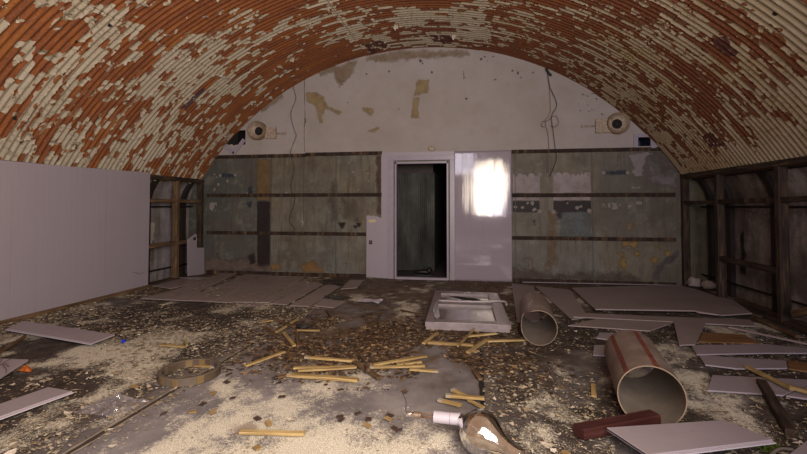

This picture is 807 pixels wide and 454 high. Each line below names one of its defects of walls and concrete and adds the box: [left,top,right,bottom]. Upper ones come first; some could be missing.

rust [712,36,738,57]
rust [180,88,205,109]
peeling [0,0,807,191]